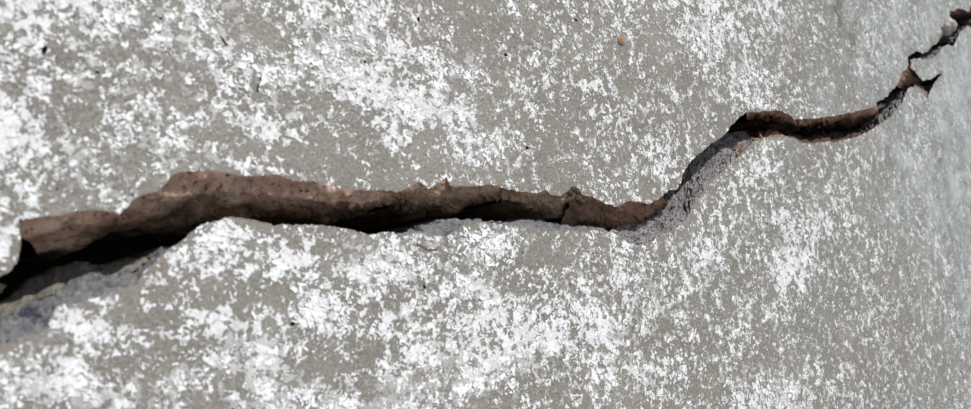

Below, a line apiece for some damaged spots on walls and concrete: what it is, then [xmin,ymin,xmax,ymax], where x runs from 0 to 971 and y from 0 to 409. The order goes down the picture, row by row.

crack [560,6,971,246]
crack [0,170,605,344]